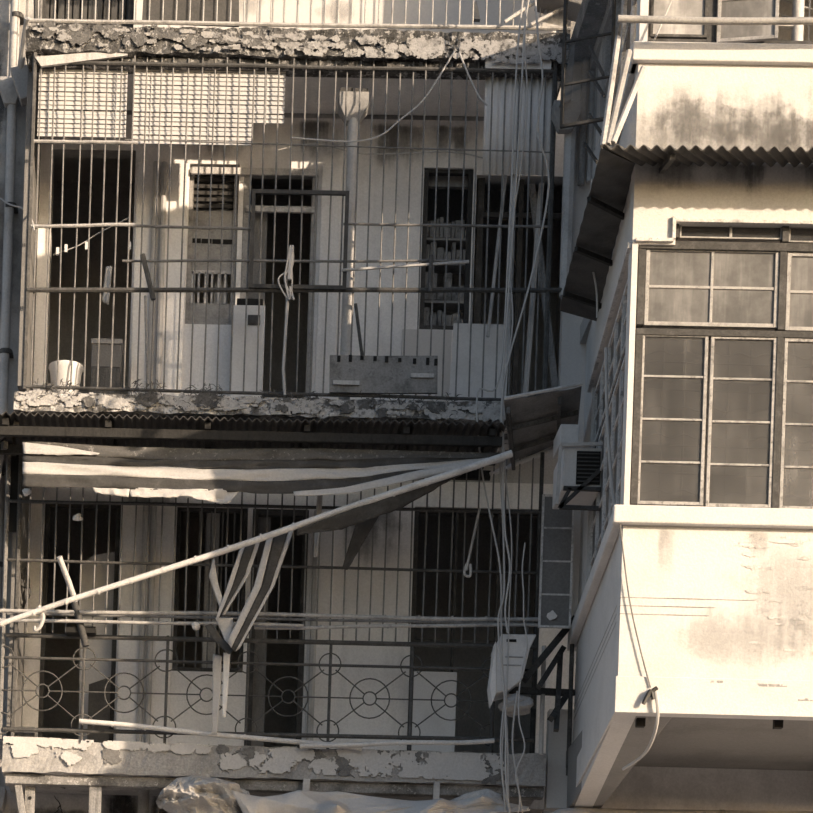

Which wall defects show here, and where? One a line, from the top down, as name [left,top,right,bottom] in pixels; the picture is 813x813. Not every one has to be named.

peeling [33,20,569,64]
peeling [16,389,506,422]
peeling [3,736,507,785]
water stain [107,795,136,813]